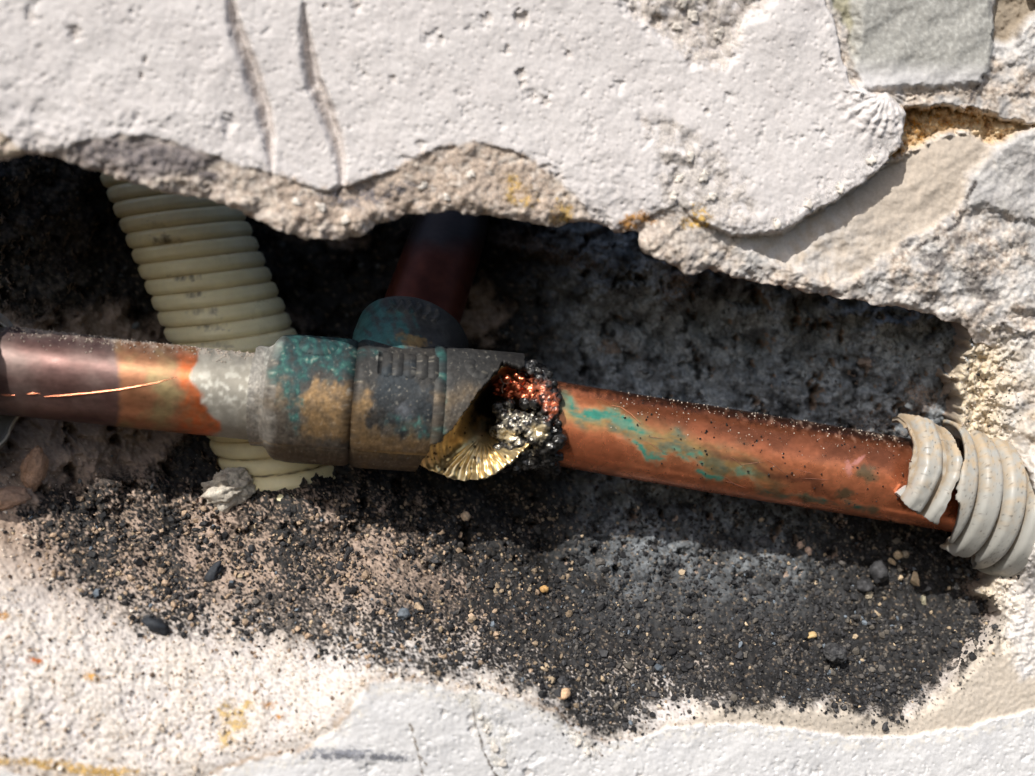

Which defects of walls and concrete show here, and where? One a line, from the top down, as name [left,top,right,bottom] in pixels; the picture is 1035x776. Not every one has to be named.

spalling [630,0,759,66]
spalling [277,144,559,236]
spalling [636,122,903,237]
spalling [911,571,926,605]
leakage [309,748,408,762]